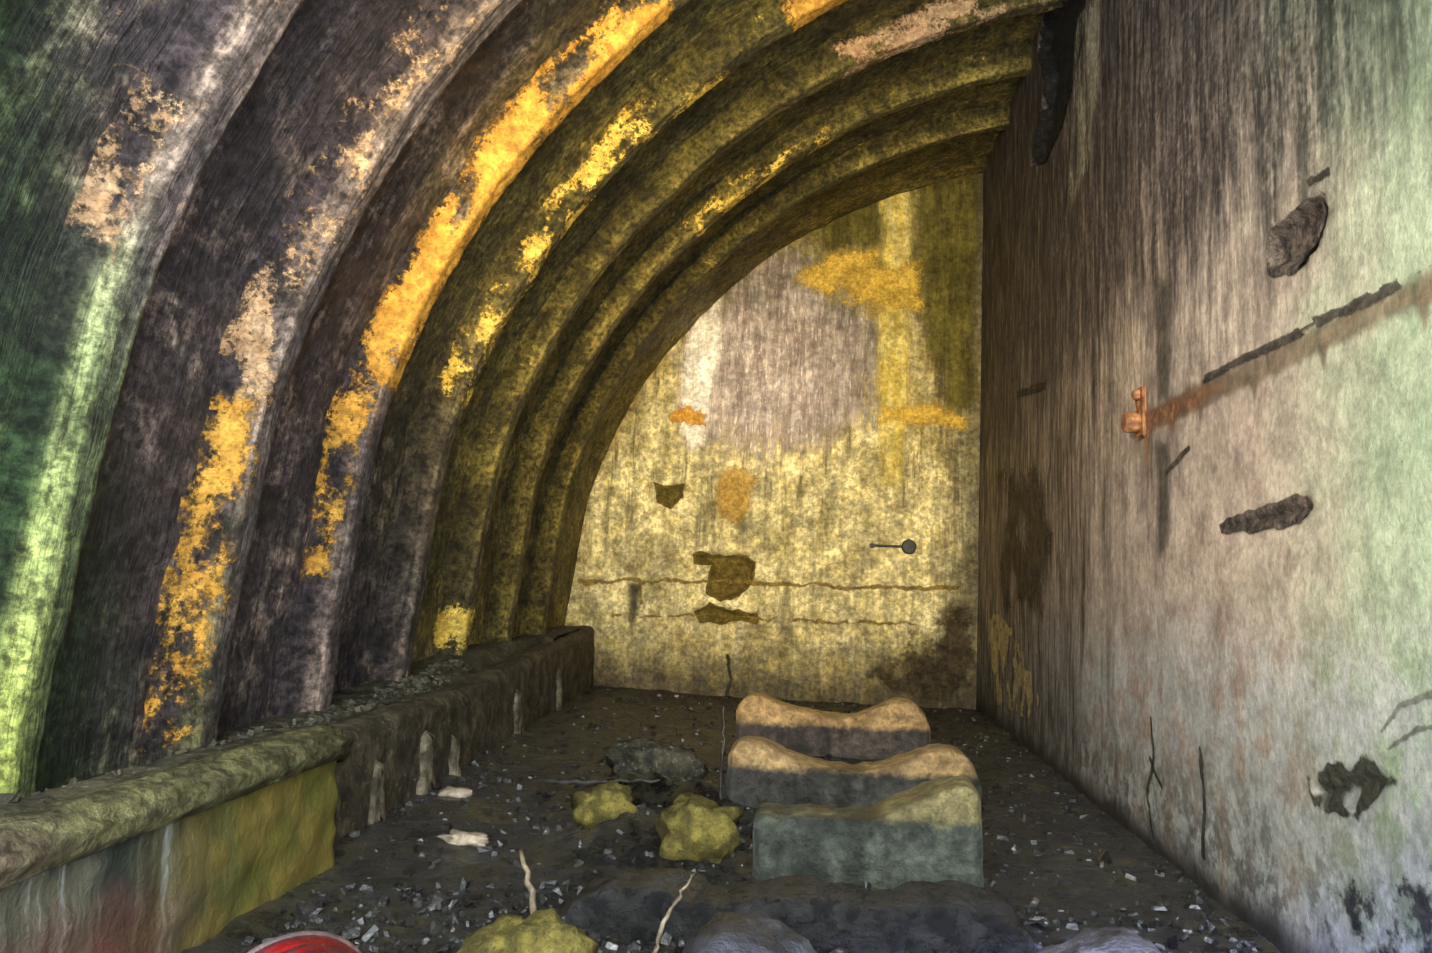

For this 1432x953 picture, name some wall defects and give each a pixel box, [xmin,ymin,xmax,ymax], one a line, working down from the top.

peeling [833,0,1013,79]
damp [1068,0,1101,203]
peeling [301,0,677,581]
peeling [438,71,727,409]
peeling [705,246,967,525]
damp [1155,276,1171,398]
rust [1145,273,1432,477]
spalling [1266,167,1330,278]
spalling [1219,493,1311,534]
spalling [693,551,758,625]
crack [1380,690,1432,749]
damp [1339,866,1432,953]